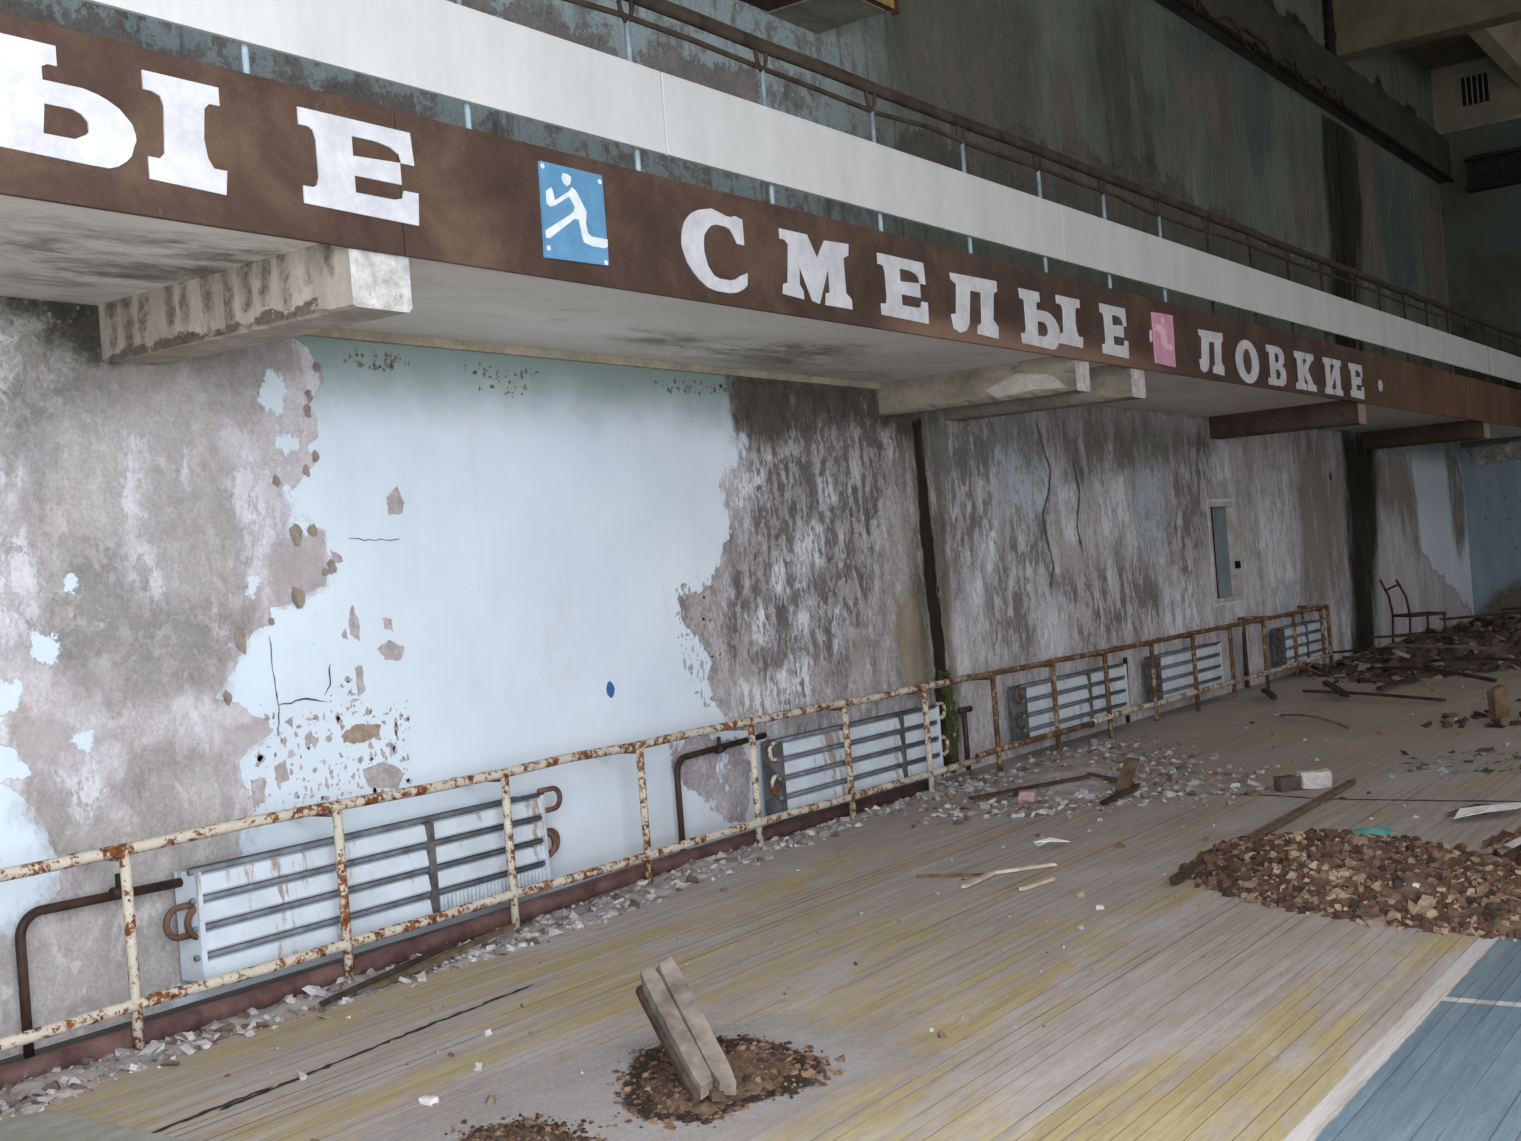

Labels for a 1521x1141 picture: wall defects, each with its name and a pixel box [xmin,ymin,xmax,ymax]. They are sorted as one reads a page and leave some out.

leakage [890,0,1025,179]
leakage [1291,114,1381,307]
leakage [1335,334,1362,351]
peeling [0,297,412,1059]
peeling [670,374,1356,823]
peeling [1374,448,1472,647]